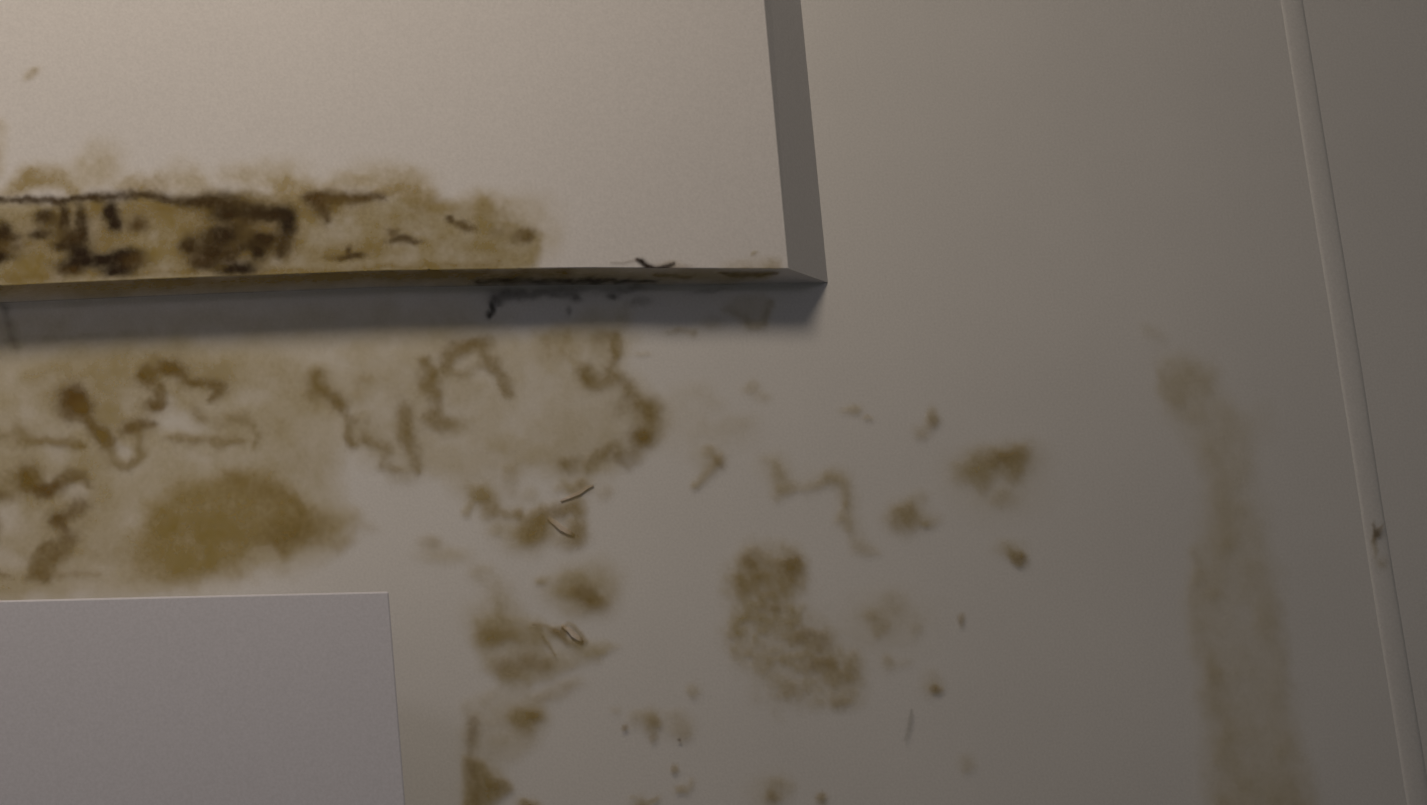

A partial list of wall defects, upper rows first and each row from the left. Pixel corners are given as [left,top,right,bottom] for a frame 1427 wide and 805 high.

leakage [0,168,533,286]
leakage [2,352,237,588]
leakage [123,471,309,575]